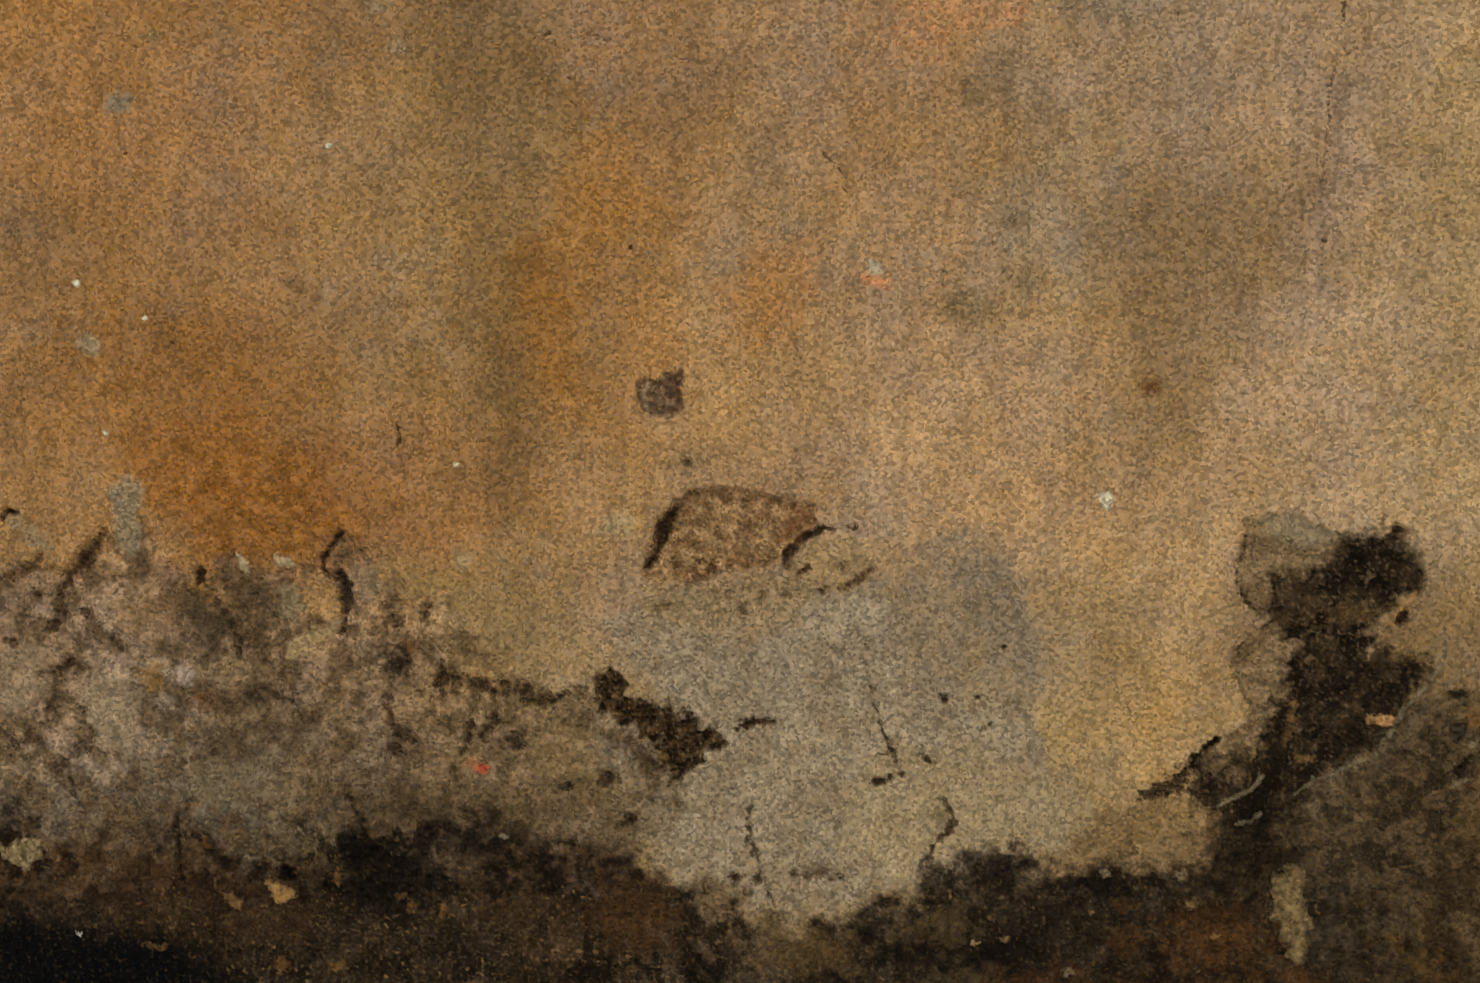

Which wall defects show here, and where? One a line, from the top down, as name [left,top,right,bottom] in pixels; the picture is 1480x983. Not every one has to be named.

spalling [635,368,686,420]
peeling [141,941,177,952]
peeling [272,952,292,976]
spalling [0,439,1108,921]
damp [0,668,1480,983]
spalling [1135,507,1480,965]